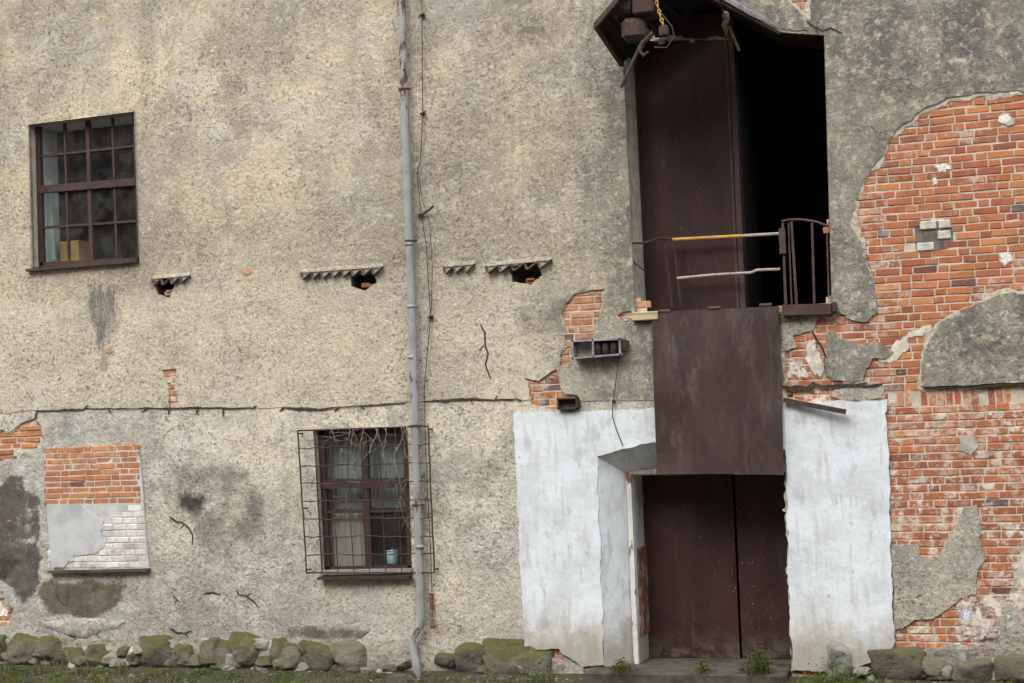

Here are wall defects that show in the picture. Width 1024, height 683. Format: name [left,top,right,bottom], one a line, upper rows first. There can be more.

flaking render [650,10,730,45]
flaking render [736,0,811,31]
flaking render [163,369,180,408]
crack [32,324,522,421]
flaking render [520,289,604,411]
flaking render [779,90,1024,650]
flaking render [0,410,43,477]
leakage [0,464,126,618]
flaking render [0,598,13,628]
flaking render [789,623,826,677]